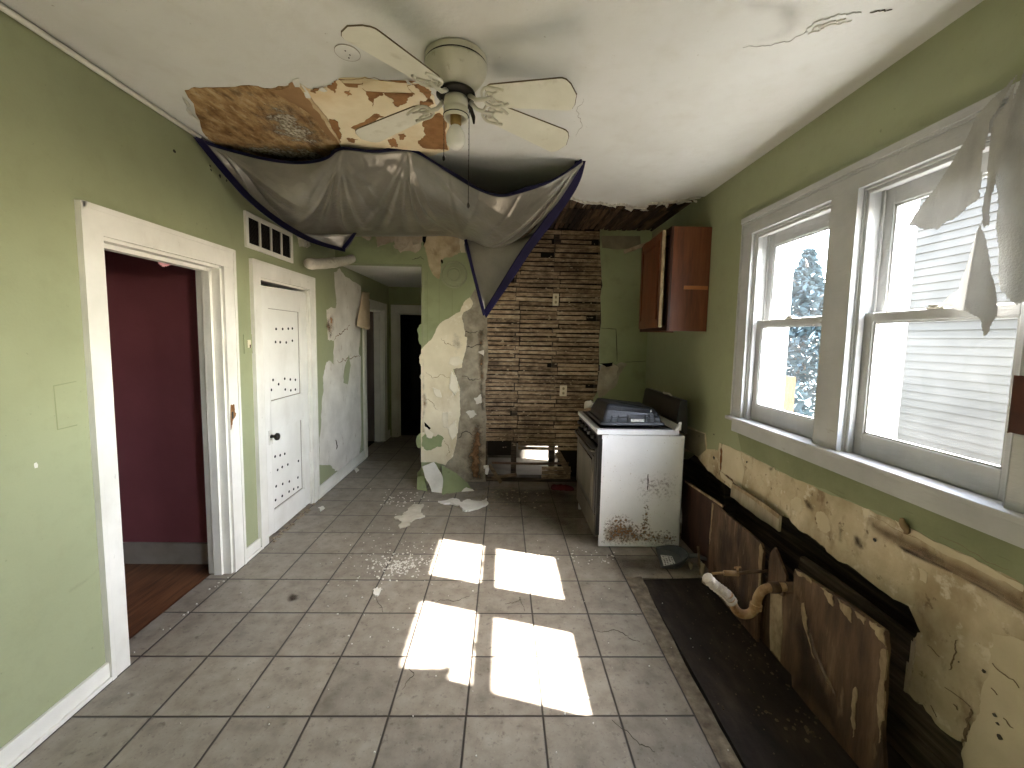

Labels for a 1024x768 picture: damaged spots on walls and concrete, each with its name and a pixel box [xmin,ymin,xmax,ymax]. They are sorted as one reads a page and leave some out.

flaking render [182,77,449,161]
spalling [570,196,701,212]
peeling [319,268,361,471]
peeling [416,289,488,482]
rust [604,505,675,544]